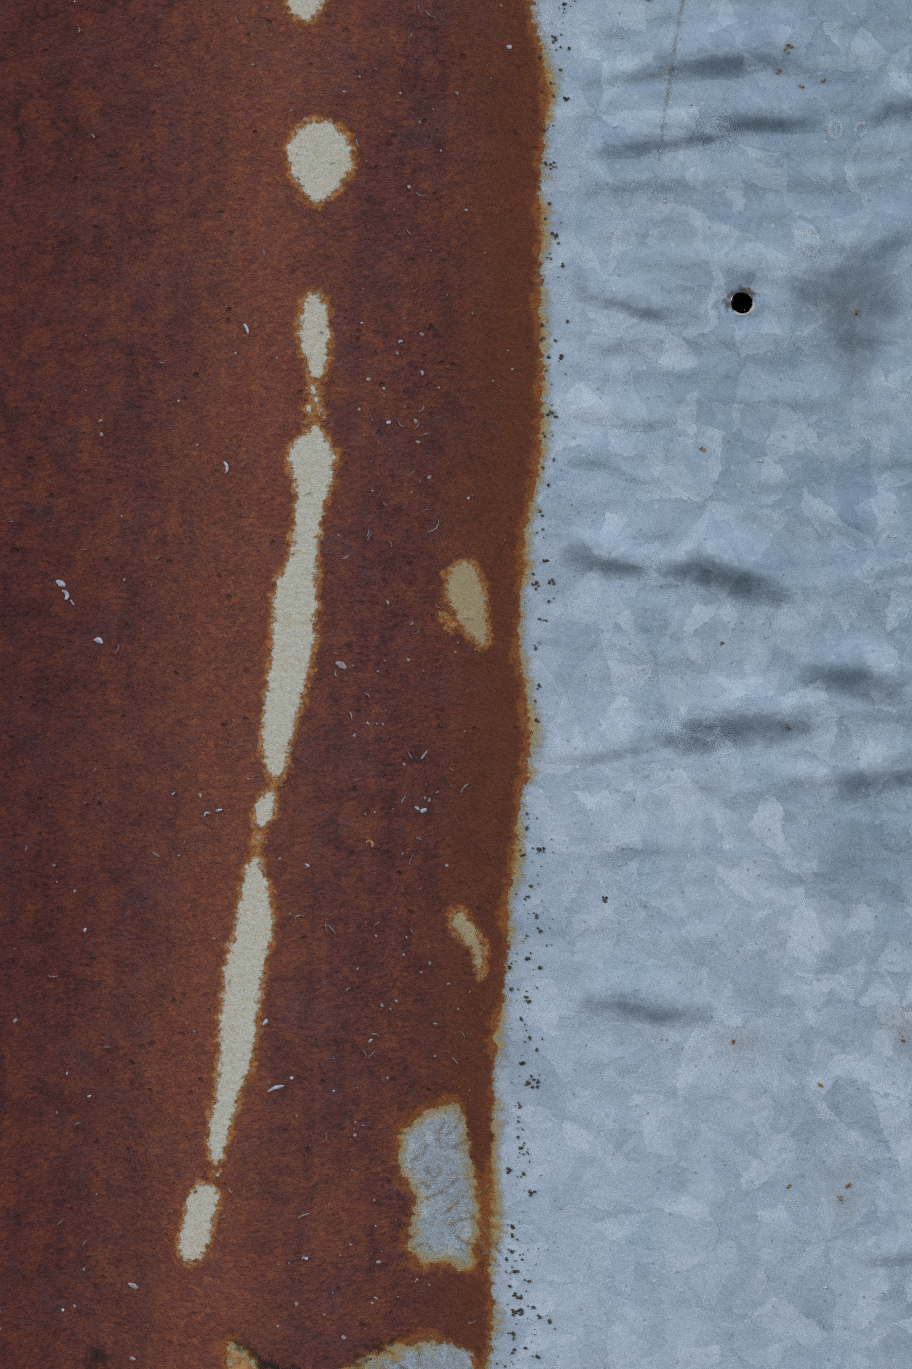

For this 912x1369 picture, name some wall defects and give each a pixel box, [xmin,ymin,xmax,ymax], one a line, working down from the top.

rust [0,0,560,1369]
peeling [226,1348,257,1369]
peeling [342,1341,475,1369]
peeling [398,805,556,1367]